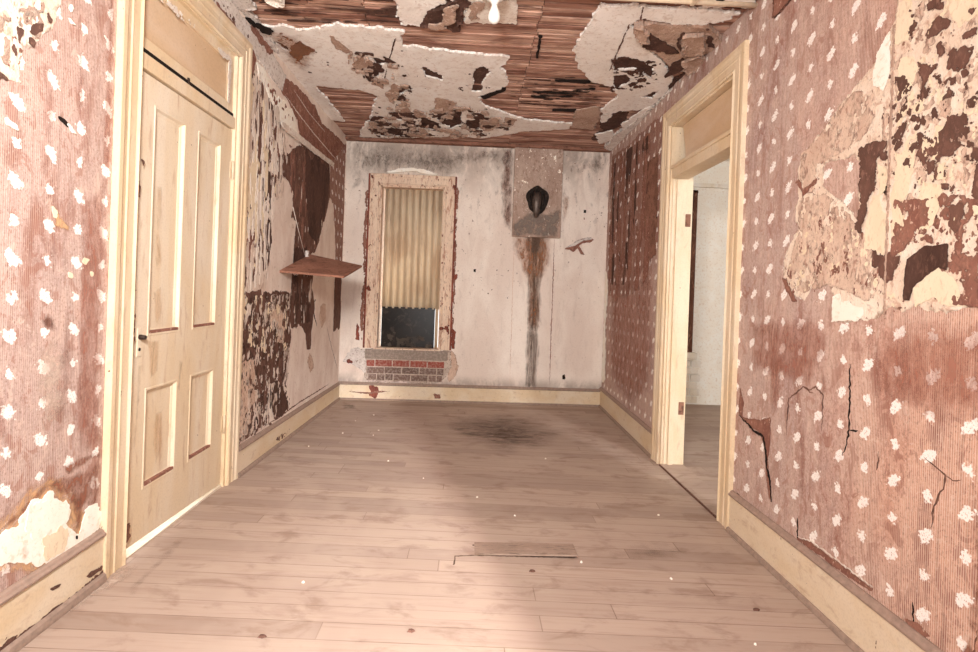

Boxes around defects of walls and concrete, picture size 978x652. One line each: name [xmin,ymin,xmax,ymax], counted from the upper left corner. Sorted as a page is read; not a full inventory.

peeling [11,13,53,56]
peeling [212,0,756,166]
peeling [908,0,977,101]
peeling [854,140,903,234]
peeling [916,109,971,233]
flaking render [343,185,466,399]
peeling [872,250,900,283]
peeling [240,294,290,441]
crack [786,386,824,434]
crack [842,365,858,454]
spalling [0,490,101,567]
crack [925,458,960,527]